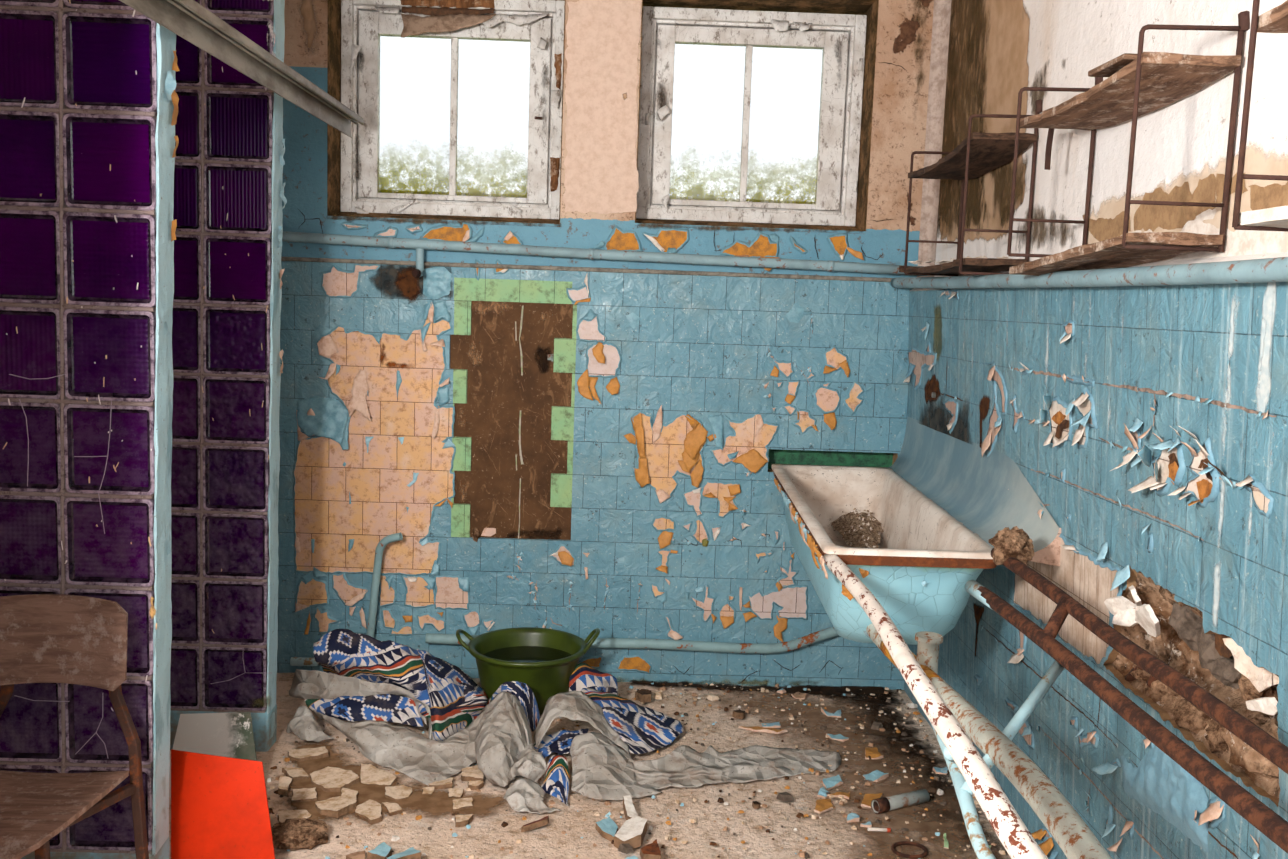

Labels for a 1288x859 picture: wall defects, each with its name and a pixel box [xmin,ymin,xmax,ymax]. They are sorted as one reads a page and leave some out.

water stain [893,0,932,84]
water stain [942,0,1046,158]
water stain [937,145,1288,247]
peeling [1082,172,1288,262]
peeling [293,301,496,636]
peeling [623,345,872,642]
spalling [1110,417,1274,519]
corrosion [880,641,898,668]
corrosion [911,651,943,680]
corrosion [973,603,984,657]
spalling [1012,514,1280,798]
corrosion [891,841,928,859]